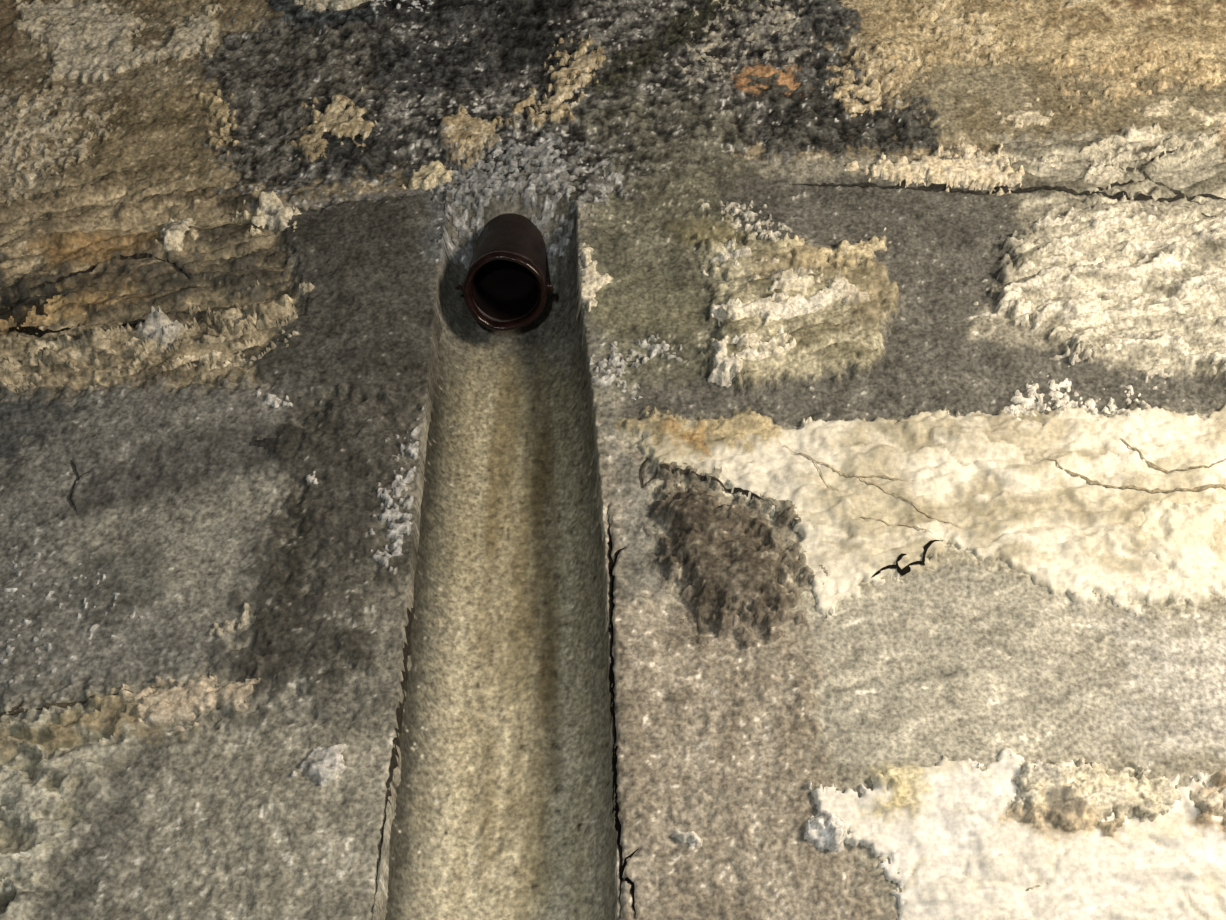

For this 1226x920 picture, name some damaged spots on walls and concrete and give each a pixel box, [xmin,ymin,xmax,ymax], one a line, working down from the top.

water stain [196,0,956,271]
crack [807,150,1226,217]
crack [0,320,145,337]
crack [30,253,190,289]
crack [778,440,970,577]
crack [607,506,639,918]